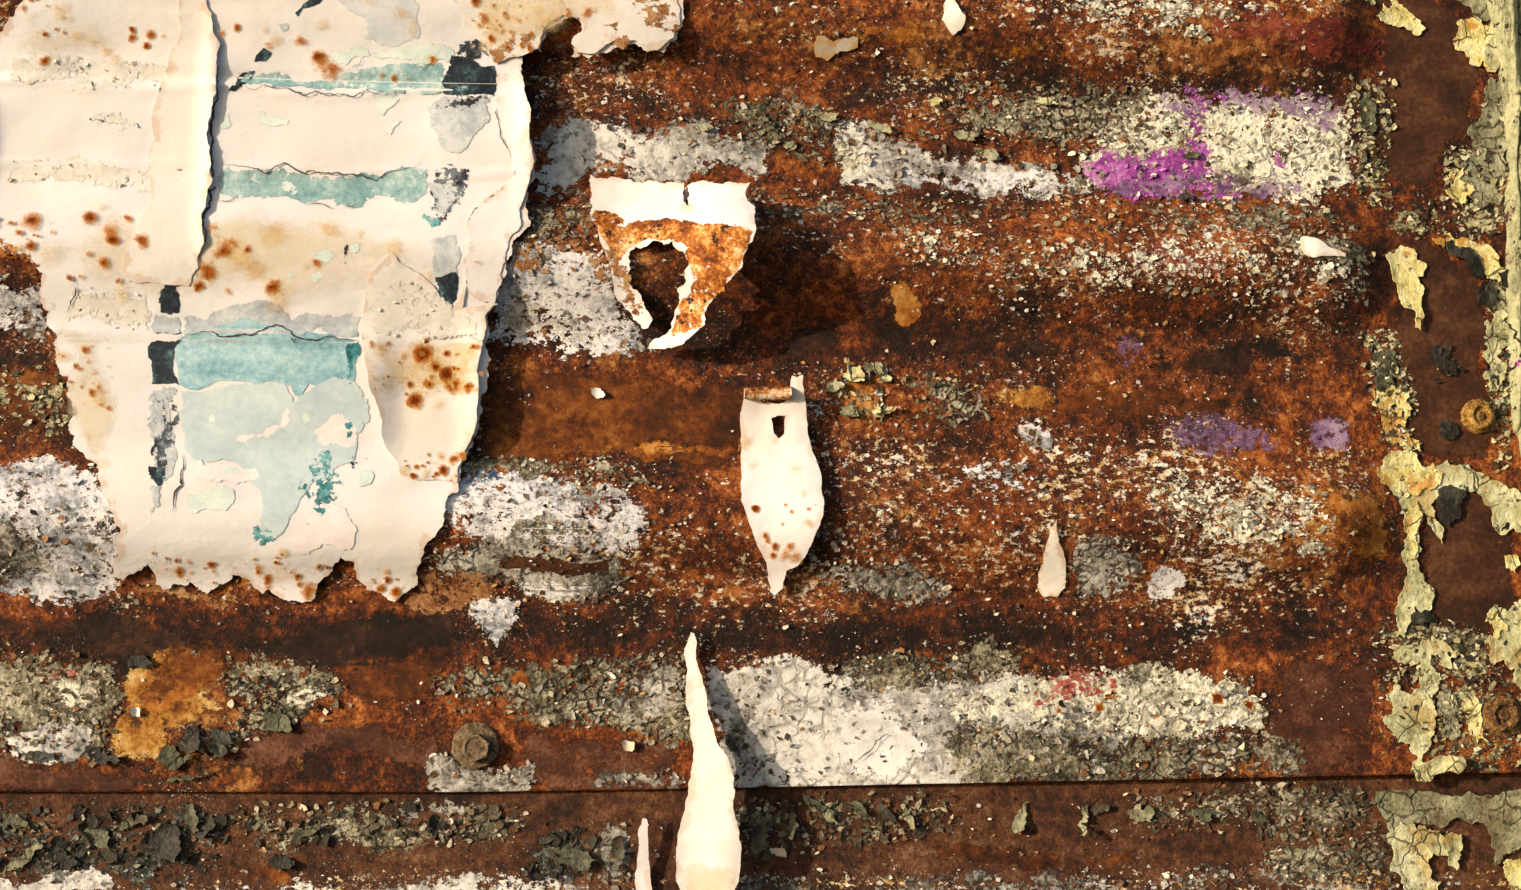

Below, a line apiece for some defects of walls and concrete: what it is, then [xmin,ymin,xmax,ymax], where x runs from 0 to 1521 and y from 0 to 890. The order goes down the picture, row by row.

peeling [7,155,151,193]
peeling [9,49,168,90]
peeling [88,112,137,129]
corrosion [1197,0,1479,188]
peeling [0,257,152,340]
corrosion [369,339,744,468]
corrosion [510,210,754,336]
corrosion [1386,236,1496,459]
corrosion [1424,491,1518,664]
corrosion [0,569,496,791]
peeling [155,641,352,783]
corrosion [1251,658,1382,777]